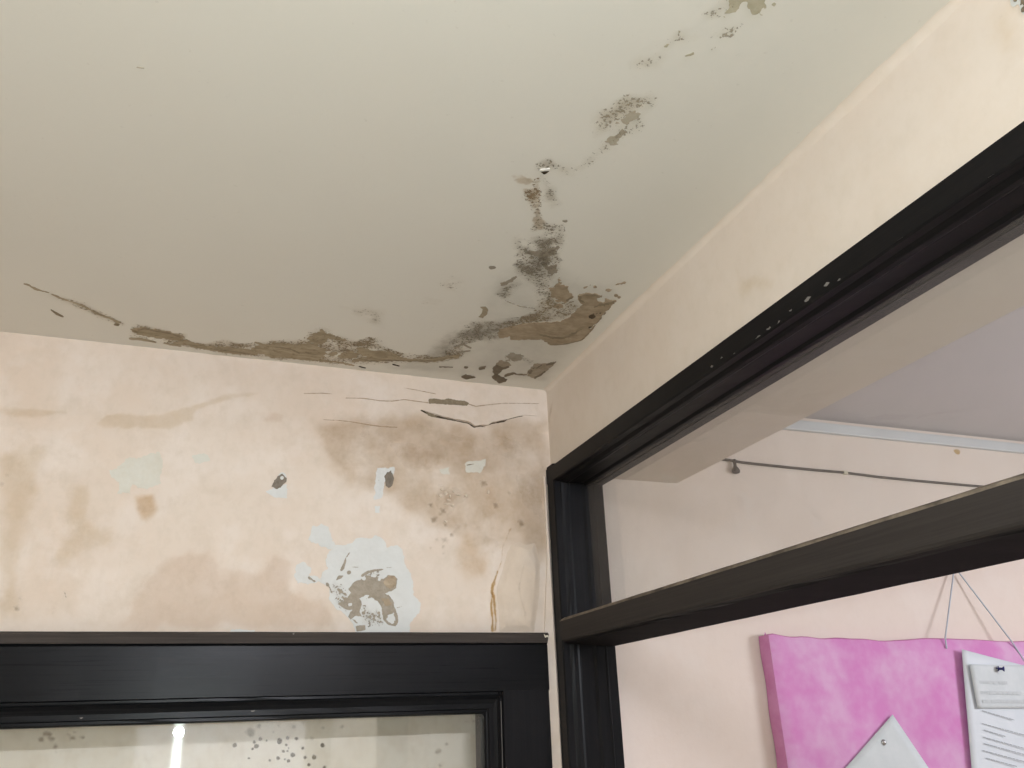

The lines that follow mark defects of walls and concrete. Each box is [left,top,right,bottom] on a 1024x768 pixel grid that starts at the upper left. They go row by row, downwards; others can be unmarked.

peeling [705,0,776,50]
peeling [581,95,656,166]
crack [24,283,121,326]
peeling [129,235,626,383]
crack [323,388,539,428]
flaking render [266,472,288,498]
flaking render [373,467,395,513]
peeling [465,459,486,473]
peeling [294,524,421,632]